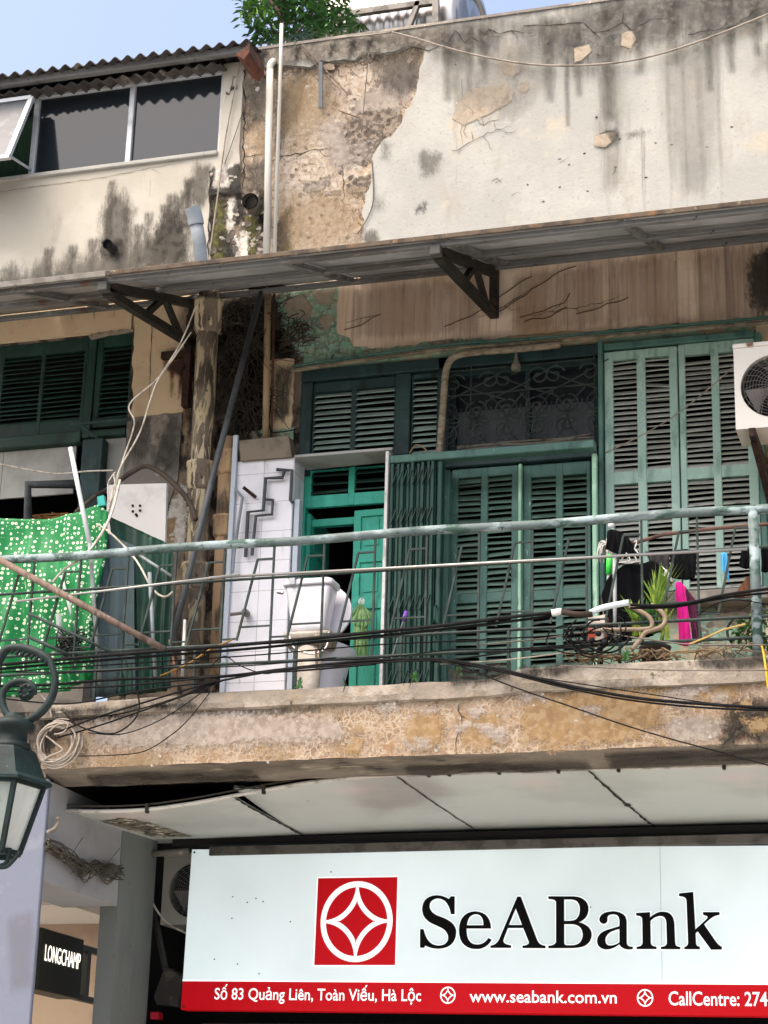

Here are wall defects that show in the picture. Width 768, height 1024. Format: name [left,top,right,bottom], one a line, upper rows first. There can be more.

peeling [573,44,599,63]
peeling [620,31,636,51]
crack [451,81,513,155]
peeling [452,81,529,126]
flaking render [208,53,421,259]
leakage [0,166,209,282]
leakage [245,216,257,254]
peeling [275,287,483,360]
crack [478,286,620,317]
leakage [607,697,768,770]
crack [396,776,477,831]
crack [588,771,655,827]